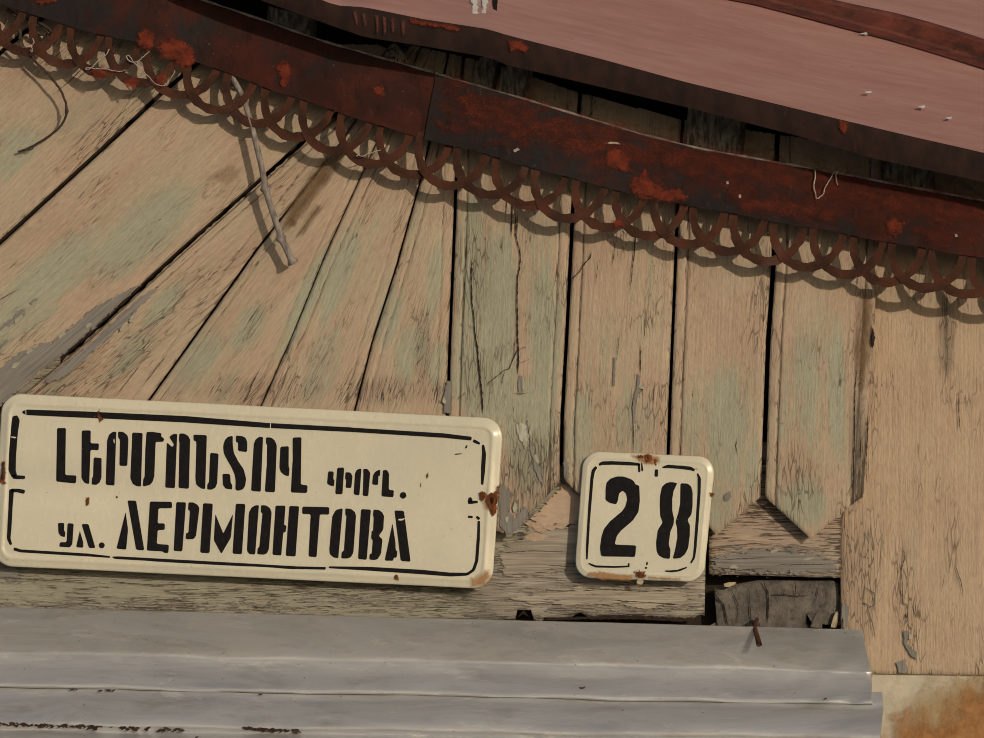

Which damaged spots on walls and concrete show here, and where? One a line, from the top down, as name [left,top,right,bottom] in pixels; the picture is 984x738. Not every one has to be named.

rust [137,29,195,70]
rust [276,61,291,87]
rust [410,18,459,31]
rust [438,77,984,236]
peeling [0,285,158,406]
crack [471,202,529,413]
rust [635,454,659,466]
rust [479,485,500,516]
peeling [497,458,690,611]
crack [900,550,963,626]